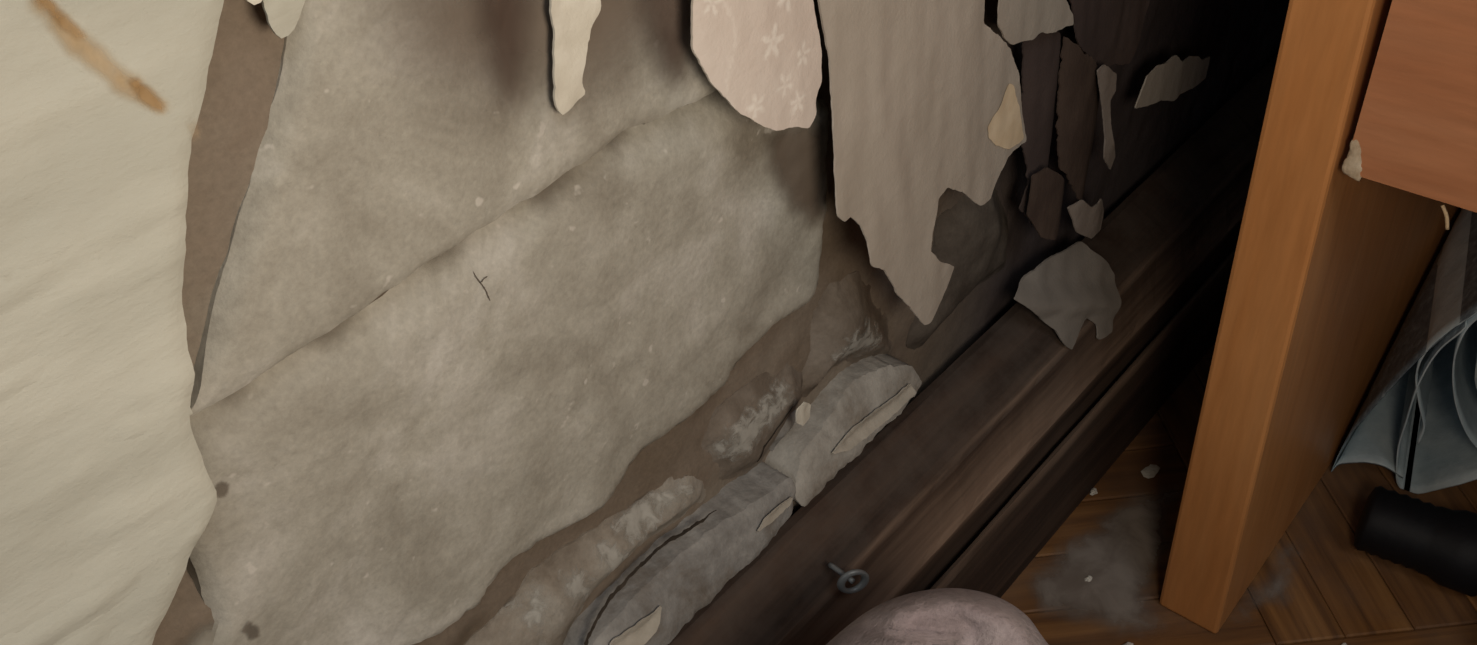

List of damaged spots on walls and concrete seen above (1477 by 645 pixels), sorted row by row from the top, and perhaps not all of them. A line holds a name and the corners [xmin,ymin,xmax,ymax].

corrosion [37,0,162,110]
peeling [246,0,305,39]
peeling [549,0,601,115]
crack [584,510,717,645]